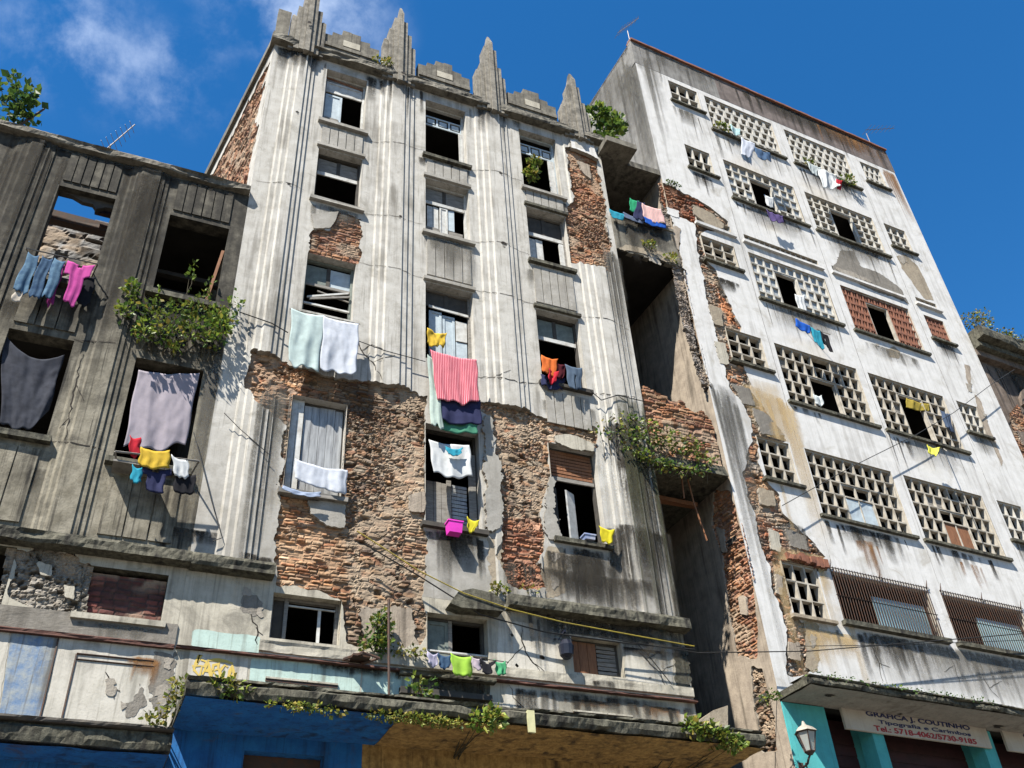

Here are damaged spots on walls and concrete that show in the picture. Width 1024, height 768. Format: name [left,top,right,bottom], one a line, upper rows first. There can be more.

damp [617,48,660,122]
spalling [213,67,269,184]
damp [736,89,882,156]
spalling [308,211,362,266]
spalling [565,139,824,752]
damp [710,385,745,453]
spalling [244,352,430,648]
spalling [480,403,597,598]
damp [825,520,907,548]
spalling [0,547,94,612]
peeling [240,587,264,618]
peeling [105,651,178,718]